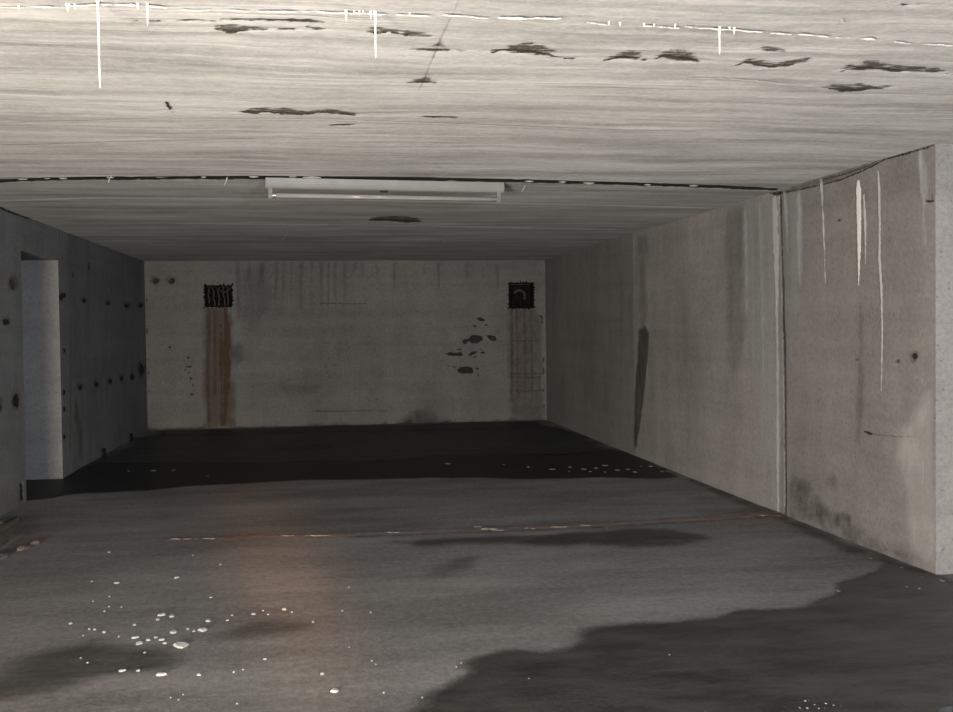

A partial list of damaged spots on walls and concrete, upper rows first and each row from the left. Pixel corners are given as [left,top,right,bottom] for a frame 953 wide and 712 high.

spalling [490,42,574,59]
spalling [734,47,810,68]
spalling [821,83,889,92]
spalling [841,60,953,75]
leakage [856,171,883,390]
rust [205,307,235,428]
spalling [445,318,496,376]
leakage [713,194,801,517]
leakage [26,329,677,500]
leakage [420,554,953,712]
leakage [0,648,164,696]